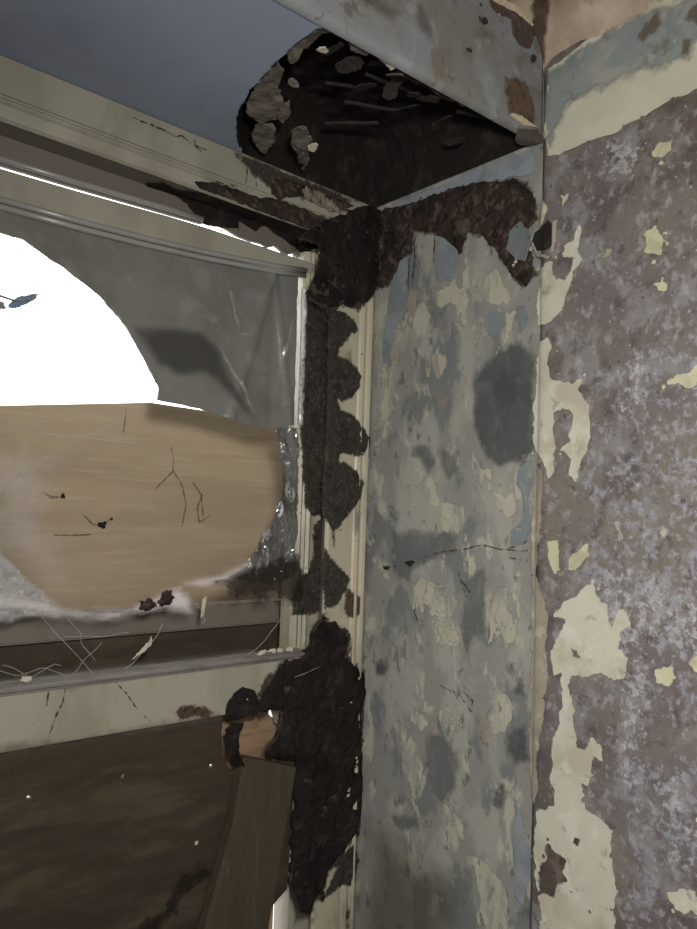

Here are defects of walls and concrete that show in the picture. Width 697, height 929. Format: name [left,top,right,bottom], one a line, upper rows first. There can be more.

flaking render [246,28,472,171]
peeling [396,0,697,207]
peeling [435,200,582,361]
peeling [643,225,669,265]
peeling [374,256,412,431]
damp [474,345,534,464]
peeling [662,365,697,389]
peeling [257,647,293,665]
peeling [408,581,461,649]
peeling [469,338,631,929]
peeling [654,666,676,686]
peeling [666,889,697,918]